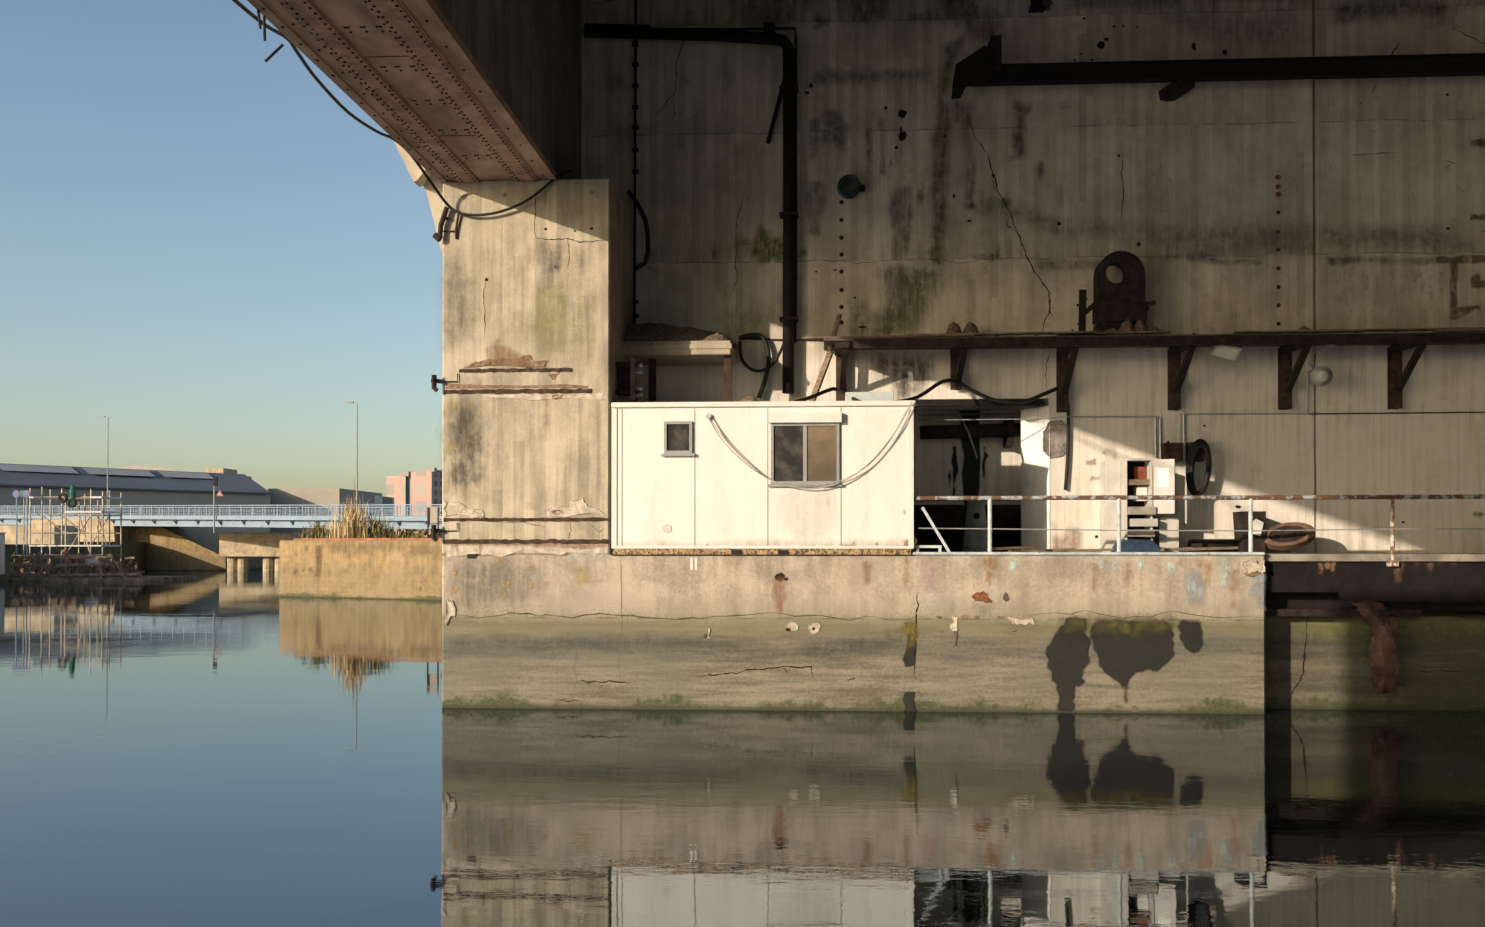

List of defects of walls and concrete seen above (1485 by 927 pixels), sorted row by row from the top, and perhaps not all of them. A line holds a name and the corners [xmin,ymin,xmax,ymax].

crack [799,108,1053,388]
damp [1046,617,1203,712]